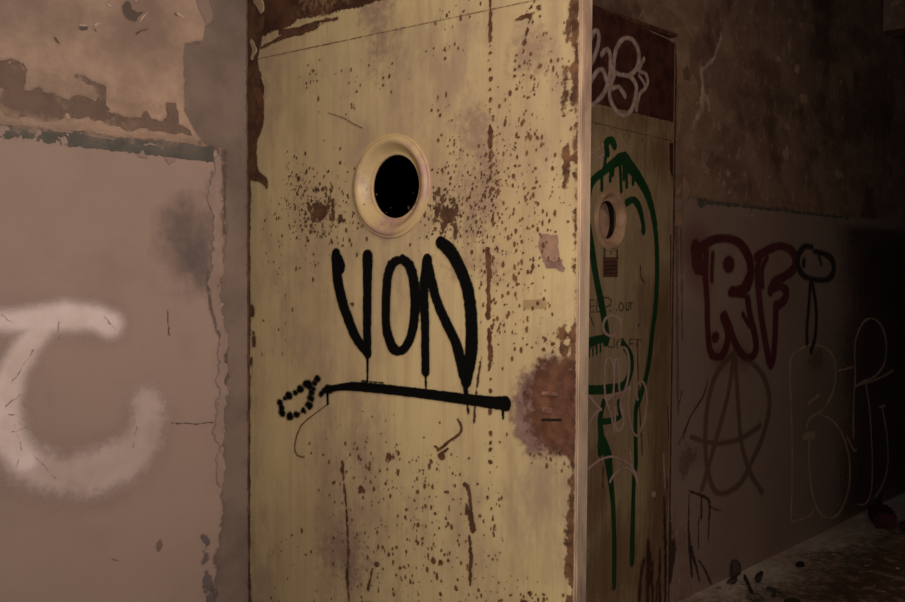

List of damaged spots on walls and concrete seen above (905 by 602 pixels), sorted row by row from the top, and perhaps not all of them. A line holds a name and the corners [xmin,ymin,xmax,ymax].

peeling [0,0,213,158]
corrosion [248,0,380,499]
corrosion [309,433,548,602]
corrosion [408,0,579,602]